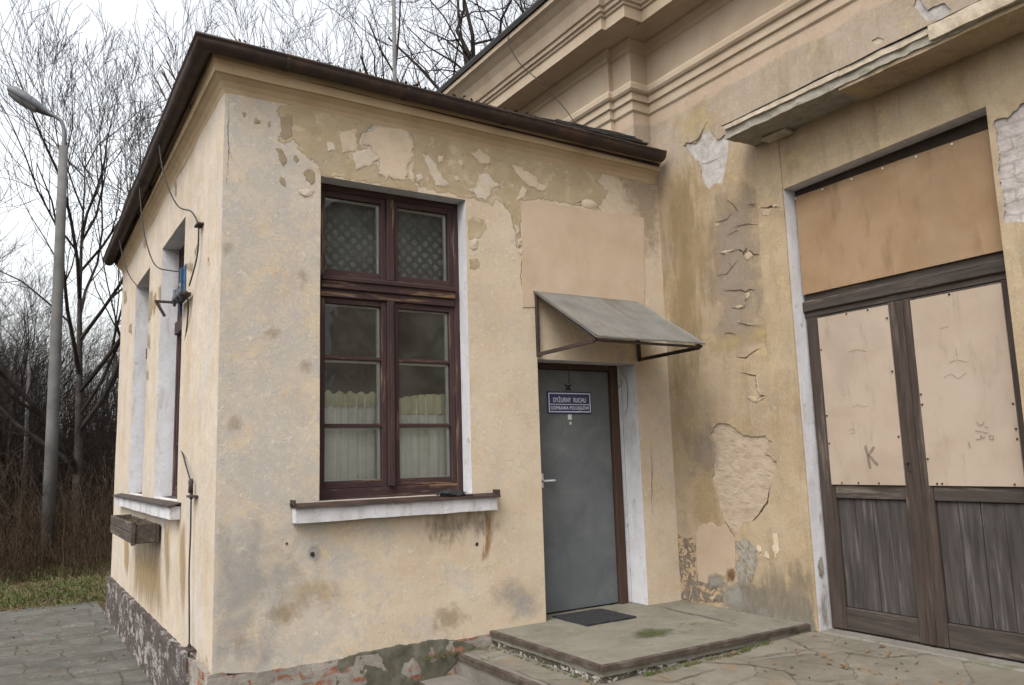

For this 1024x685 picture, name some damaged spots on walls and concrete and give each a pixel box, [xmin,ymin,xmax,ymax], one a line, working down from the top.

peeling [242,104,608,254]
peeling [468,217,486,269]
crack [715,200,779,402]
flaking render [684,0,951,189]
flaking render [995,103,1024,223]
flaking render [678,534,724,603]
flaking render [711,423,780,587]